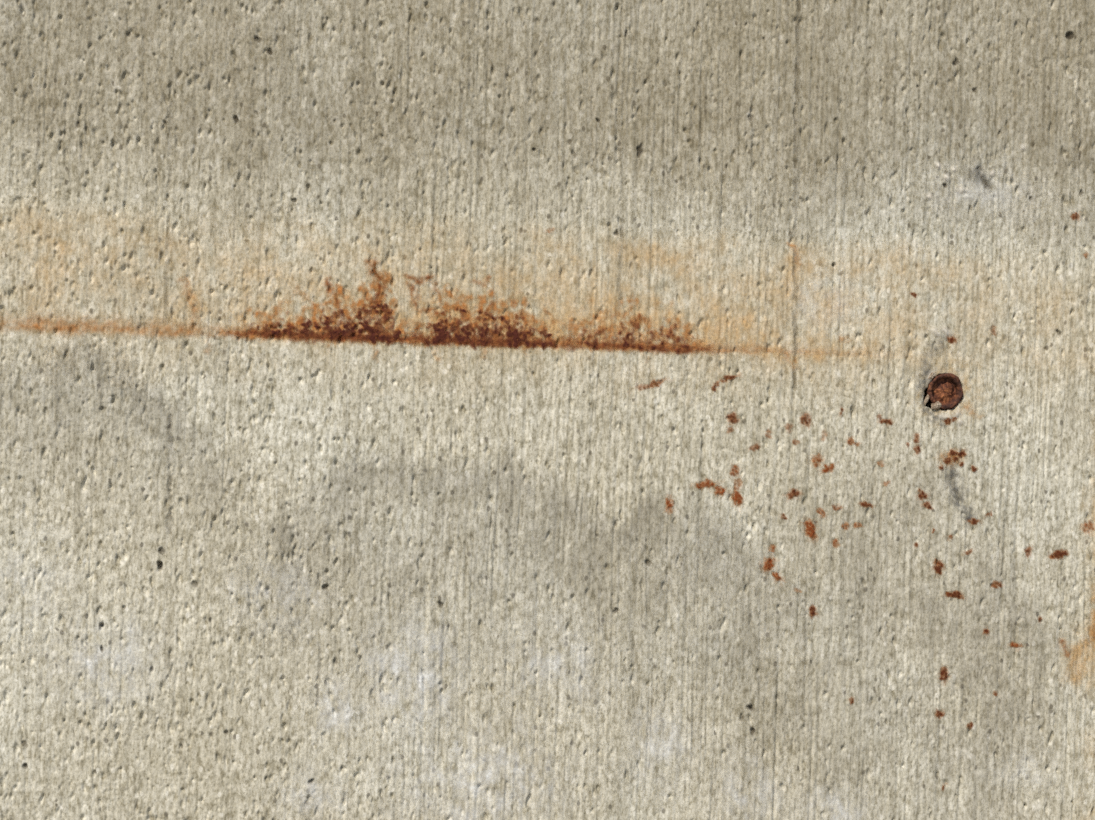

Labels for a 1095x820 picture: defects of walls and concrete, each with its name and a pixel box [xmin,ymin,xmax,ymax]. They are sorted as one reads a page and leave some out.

corrosion [20,319,193,335]
corrosion [219,260,787,357]